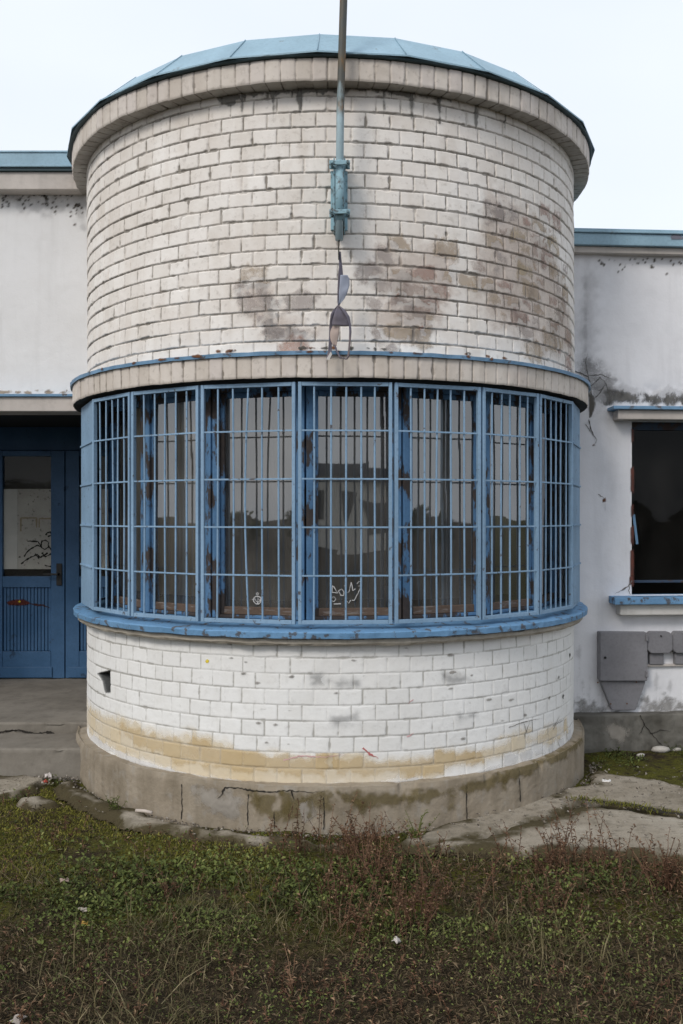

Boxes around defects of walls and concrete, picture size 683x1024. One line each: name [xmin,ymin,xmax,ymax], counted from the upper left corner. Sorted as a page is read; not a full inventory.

leakage [604,389,683,406]
crack [0,727,55,735]
leakage [87,708,572,822]
crack [218,787,325,830]